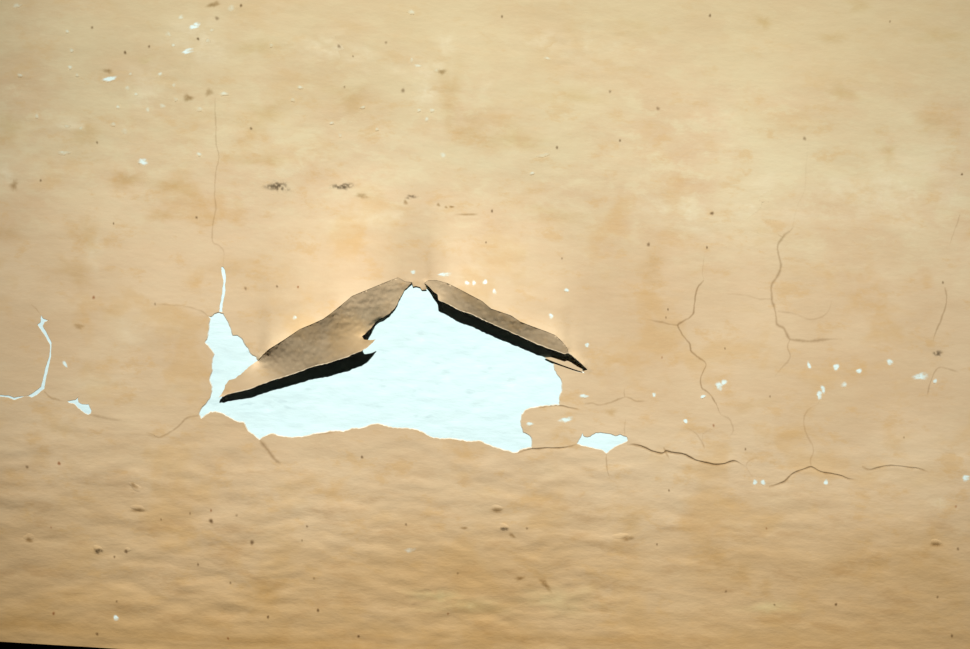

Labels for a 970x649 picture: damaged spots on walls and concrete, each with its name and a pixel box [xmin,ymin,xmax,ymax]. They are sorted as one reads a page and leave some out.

peeling [199,269,587,453]
peeling [67,398,92,415]
peeling [577,432,628,454]